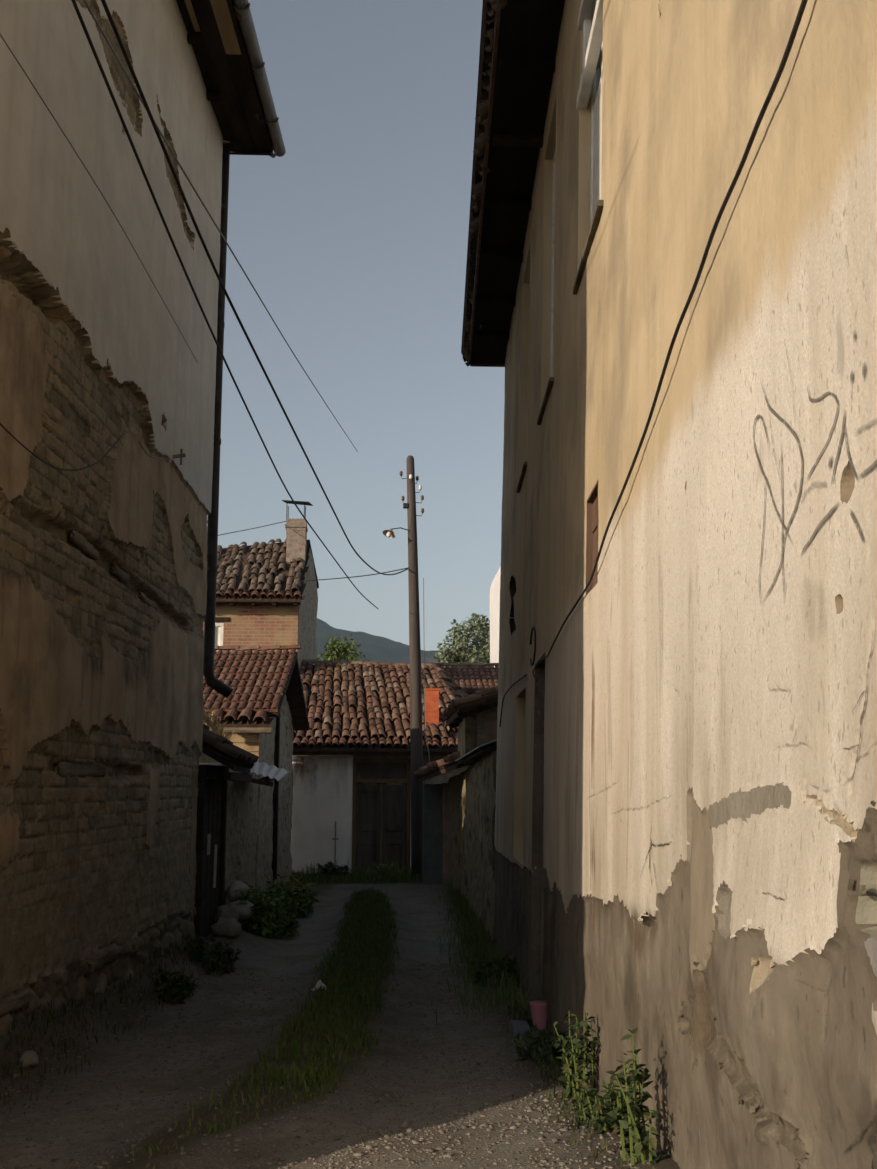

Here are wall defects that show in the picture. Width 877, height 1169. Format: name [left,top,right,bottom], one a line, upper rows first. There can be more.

spalling [76,0,143,137]
spalling [156,93,195,250]
spalling [0,228,208,668]
peeling [493,794,877,1169]